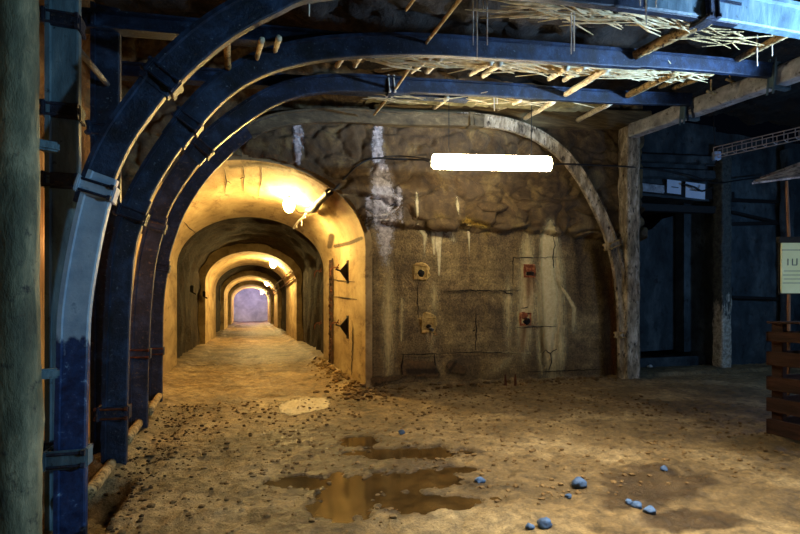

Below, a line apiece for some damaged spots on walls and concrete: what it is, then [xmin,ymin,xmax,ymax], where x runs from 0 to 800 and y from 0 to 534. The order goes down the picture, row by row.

leakage [229,125,346,212]
leakage [366,126,403,296]
crack [523,349,596,373]